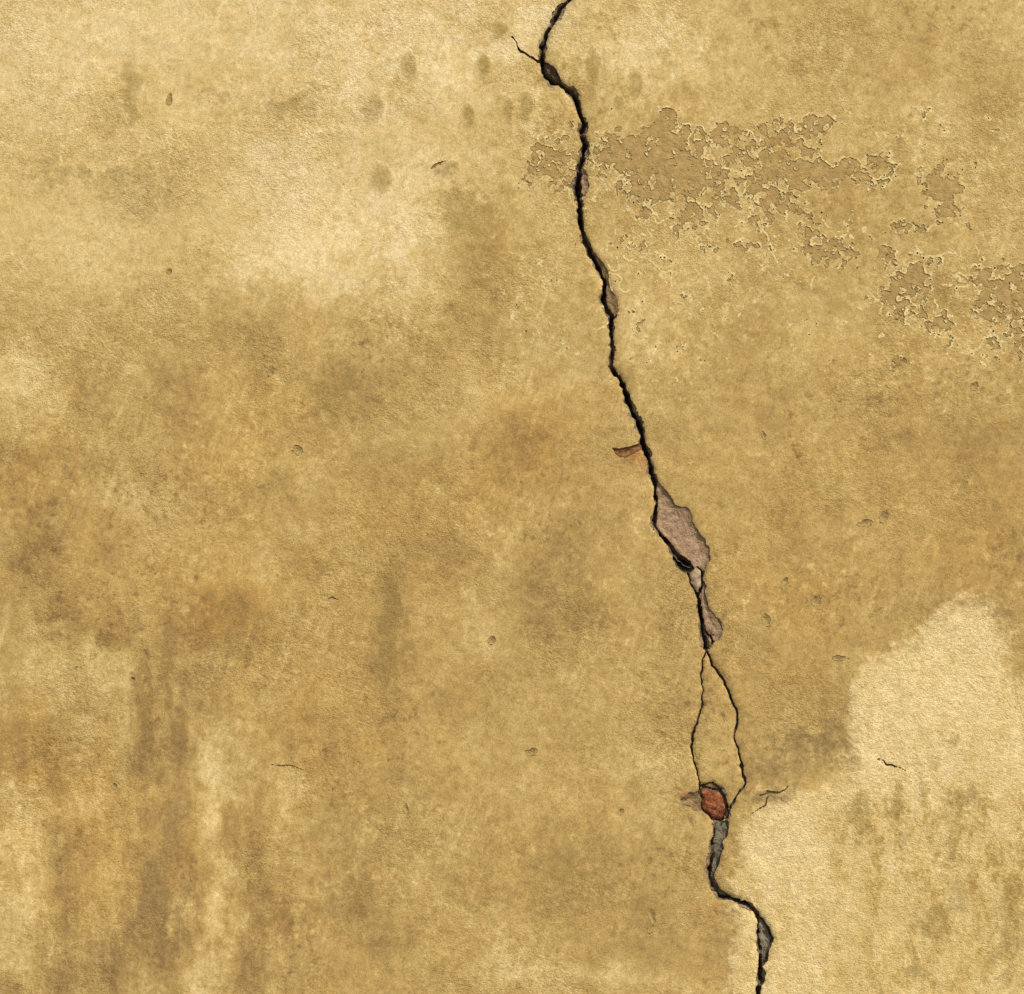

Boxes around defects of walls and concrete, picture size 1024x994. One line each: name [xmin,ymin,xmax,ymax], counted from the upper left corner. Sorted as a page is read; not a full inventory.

peeling [520,105,1024,391]
leakage [367,530,415,712]
crack [511,0,788,994]
flaking render [656,481,723,641]
leakage [45,790,77,916]
leakage [66,603,199,981]
leakage [241,868,292,975]
leakage [323,843,426,978]